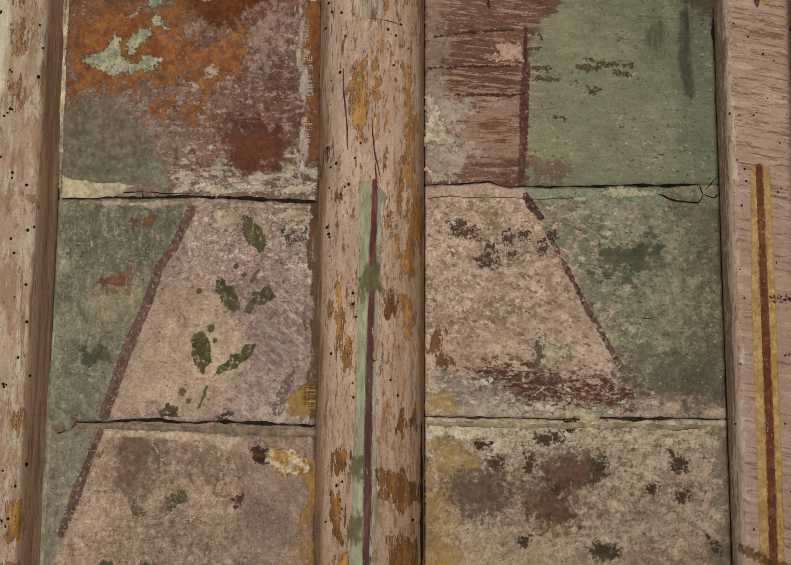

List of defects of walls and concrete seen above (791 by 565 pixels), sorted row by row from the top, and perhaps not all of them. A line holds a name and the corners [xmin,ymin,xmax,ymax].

rust [64,0,269,126]
rust [300,0,321,166]
peeling [428,29,561,82]
rust [218,113,284,178]
crack [61,191,317,203]
crack [427,177,719,204]
peeling [325,271,354,373]
crack [57,417,315,433]
crack [599,415,719,423]
peeling [374,467,422,516]
crack [420,415,580,565]
peeling [326,489,349,565]